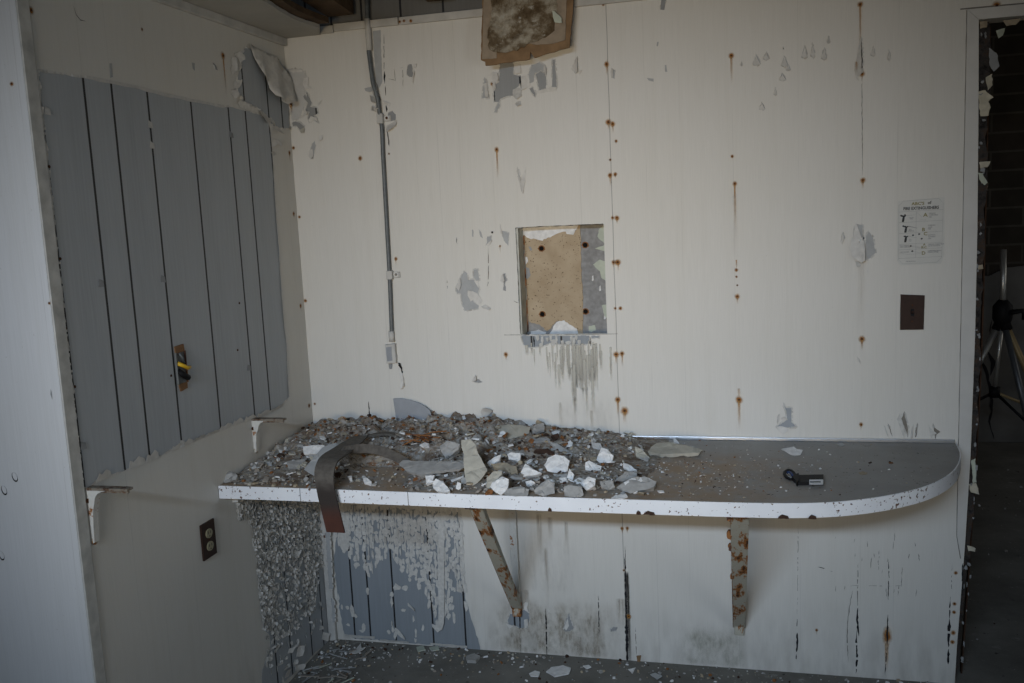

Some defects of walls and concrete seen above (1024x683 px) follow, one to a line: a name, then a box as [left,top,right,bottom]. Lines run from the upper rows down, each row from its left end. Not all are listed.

peeling [287,67,323,159]
peeling [481,59,558,113]
peeling [455,268,491,312]
water stain [525,341,612,396]
spalling [955,18,1021,681]
peeling [235,499,480,683]